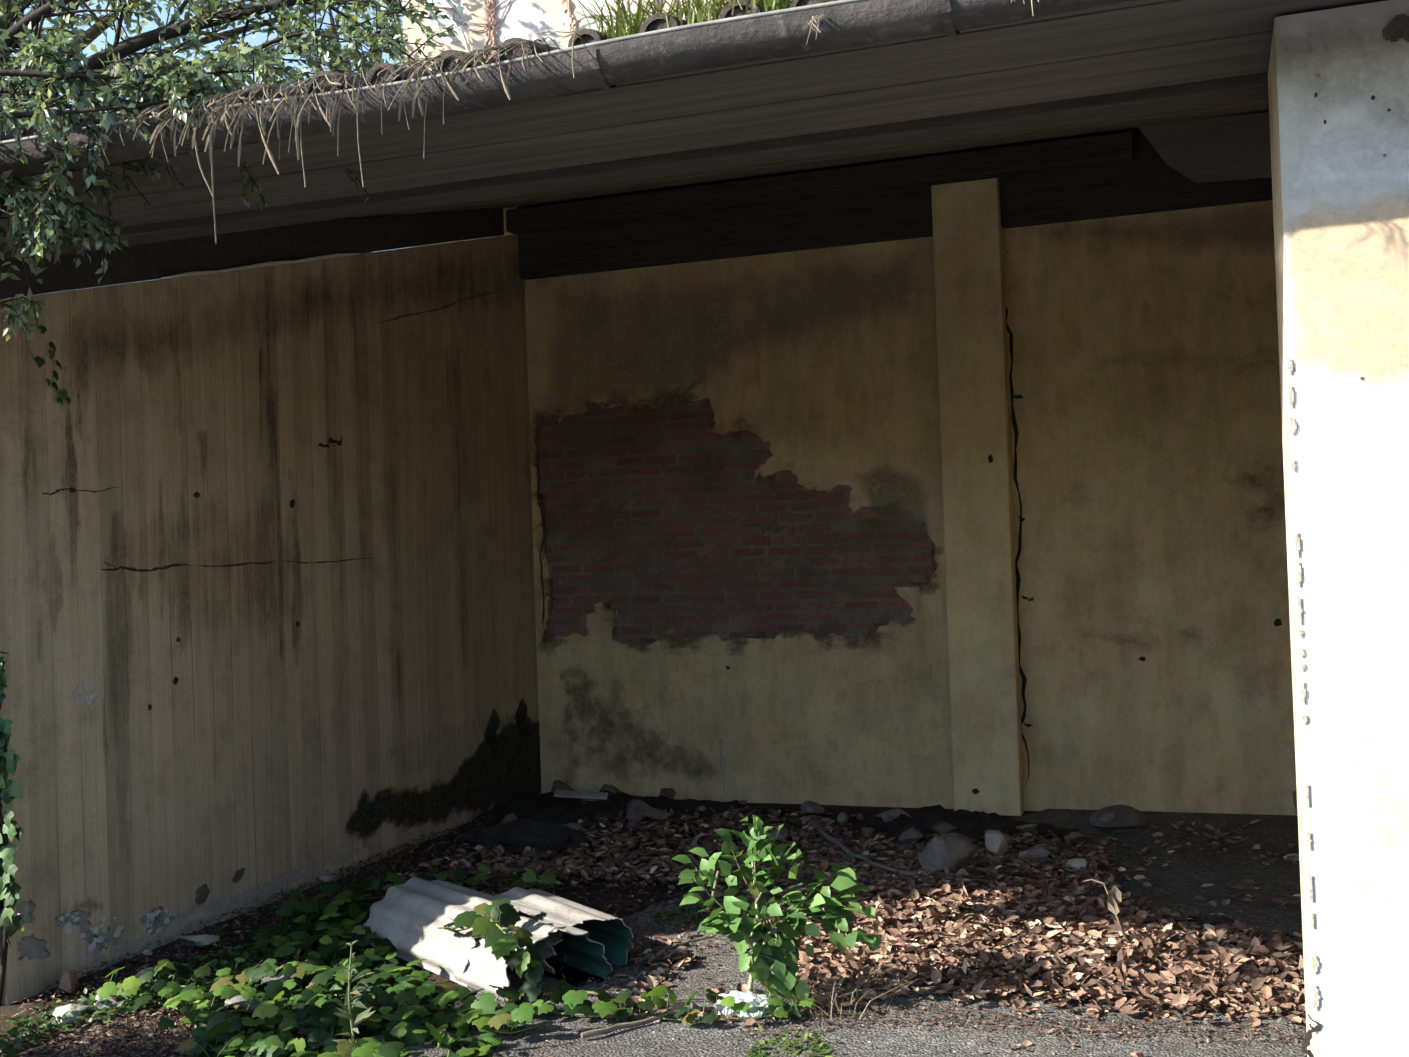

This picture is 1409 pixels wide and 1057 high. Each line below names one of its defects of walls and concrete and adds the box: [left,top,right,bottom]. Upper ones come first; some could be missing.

crack [42,487,118,495]
crack [100,558,369,572]
flaking render [533,384,938,669]
crack [1006,307,1034,786]
water stain [338,698,542,862]
spalling [54,906,173,957]